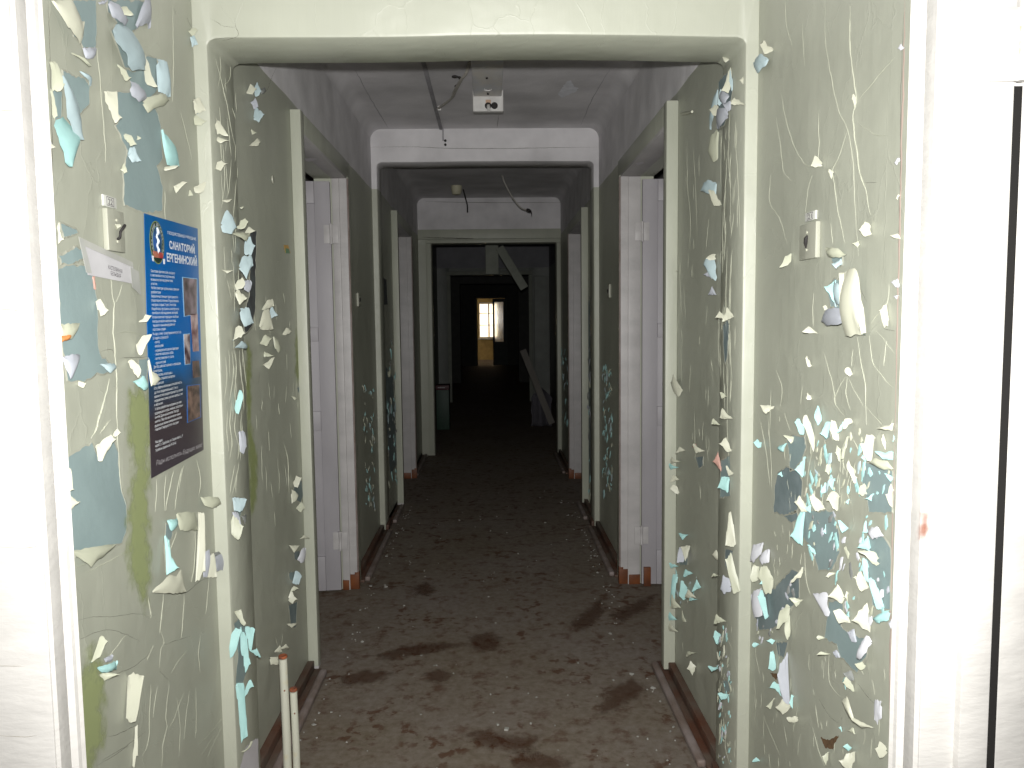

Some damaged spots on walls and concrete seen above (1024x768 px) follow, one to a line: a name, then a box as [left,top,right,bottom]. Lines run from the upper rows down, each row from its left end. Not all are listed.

peeling [48,0,206,214]
peeling [193,61,292,382]
crack [769,6,891,256]
peeling [55,221,128,573]
mould [129,390,150,599]
peeling [119,314,161,392]
peeling [81,496,247,636]
crack [155,463,201,509]
crack [142,635,221,756]
peeling [229,535,308,768]
peeling [686,614,736,764]
peeling [708,12,905,768]